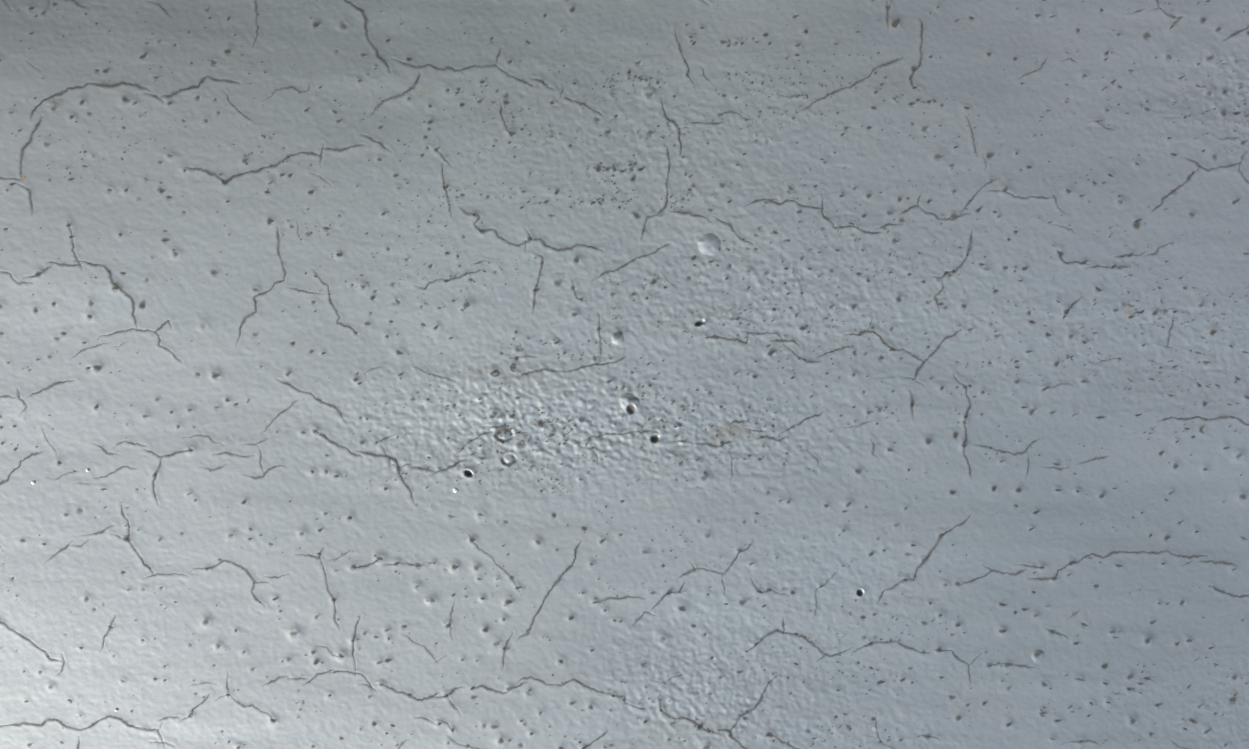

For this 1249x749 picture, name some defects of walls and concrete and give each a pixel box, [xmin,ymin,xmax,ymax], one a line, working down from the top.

crack [345,0,600,114]
crack [5,228,175,357]
crack [22,78,244,155]
crack [190,137,385,183]
crack [239,232,354,336]
crack [442,104,748,308]
crack [752,195,975,305]
crack [710,326,958,403]
crack [278,383,502,495]
crack [506,546,578,645]
crack [302,604,768,749]
crack [6,716,162,748]